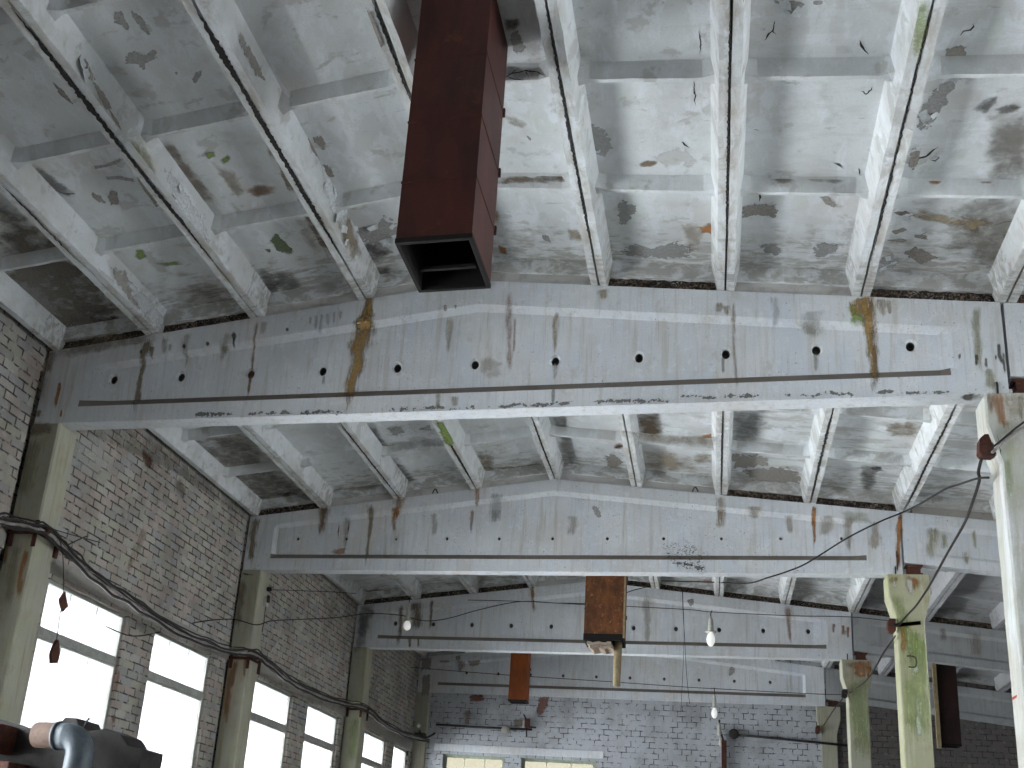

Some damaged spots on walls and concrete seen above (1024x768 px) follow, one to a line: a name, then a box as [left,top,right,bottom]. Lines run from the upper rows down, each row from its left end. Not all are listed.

peeling [125,50,157,70]
peeling [917,78,961,131]
leakage [977,97,1024,169]
peeling [617,200,636,225]
peeling [622,241,693,260]
peeling [879,208,938,272]
leakage [915,199,1012,263]
rust [134,341,154,404]
rust [345,298,375,404]
rust [850,297,878,383]
rust [993,395,1005,424]
rust [891,515,902,582]